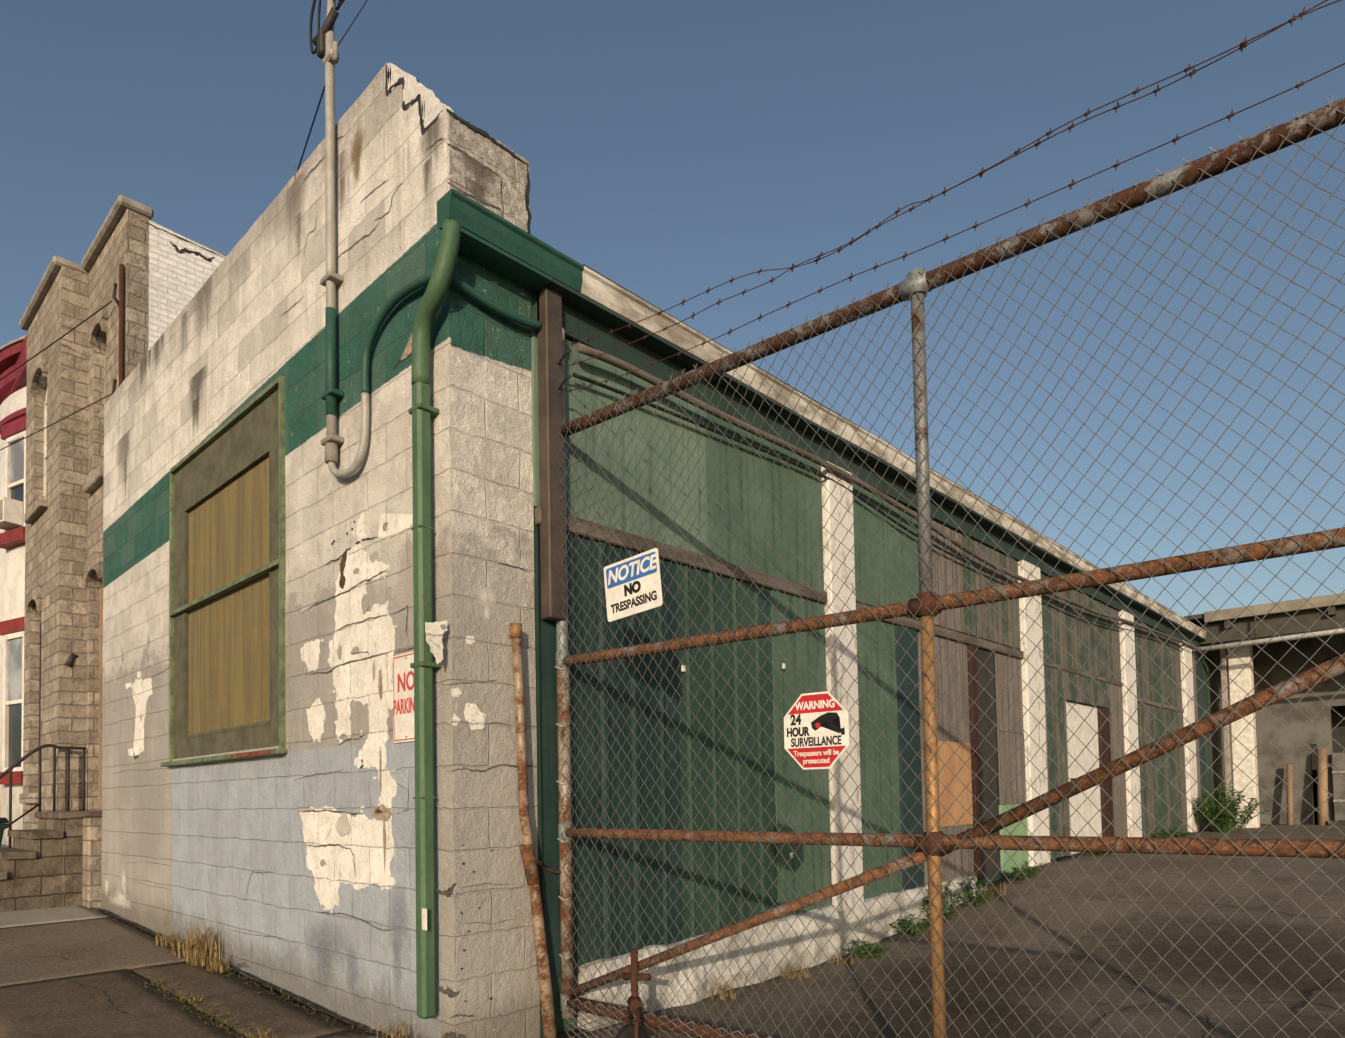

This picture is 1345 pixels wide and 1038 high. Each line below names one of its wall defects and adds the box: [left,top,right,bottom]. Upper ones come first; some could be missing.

crack [141,220,226,262]
crack [338,180,402,258]
peeling [425,621,448,664]
peeling [125,671,152,759]
peeling [299,510,413,913]
peeling [448,687,486,731]
crack [1085,977,1345,1038]